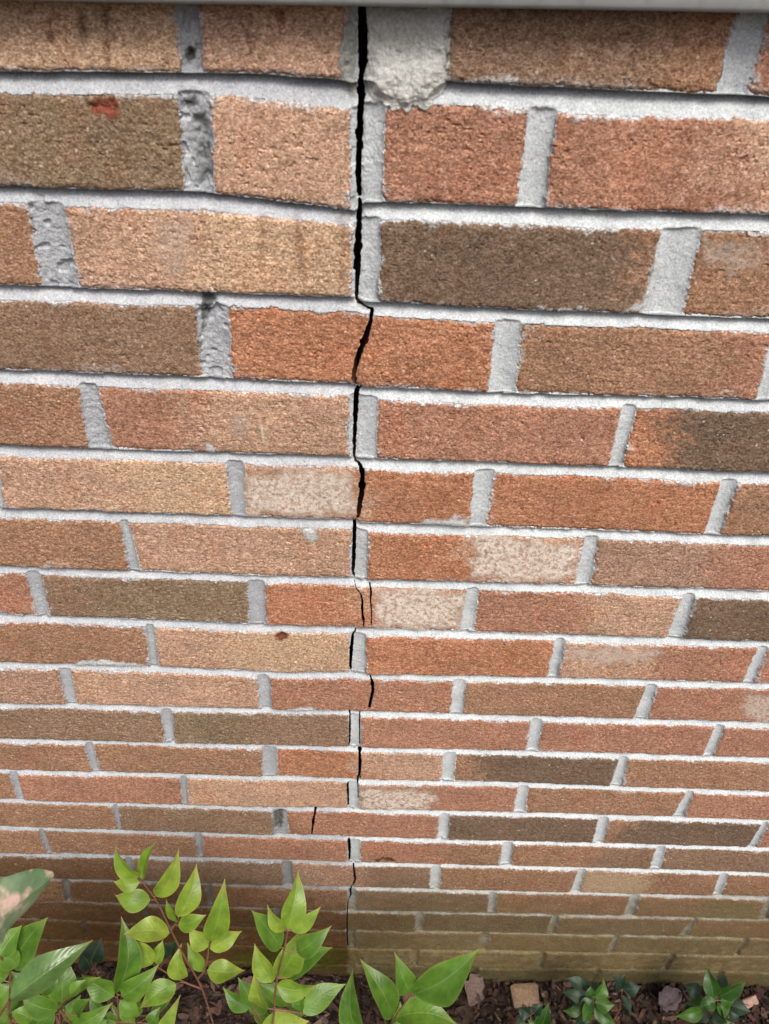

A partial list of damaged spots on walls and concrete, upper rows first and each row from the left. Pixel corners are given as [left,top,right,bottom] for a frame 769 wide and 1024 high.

crack [346,6,375,791]
crack [346,838,357,939]